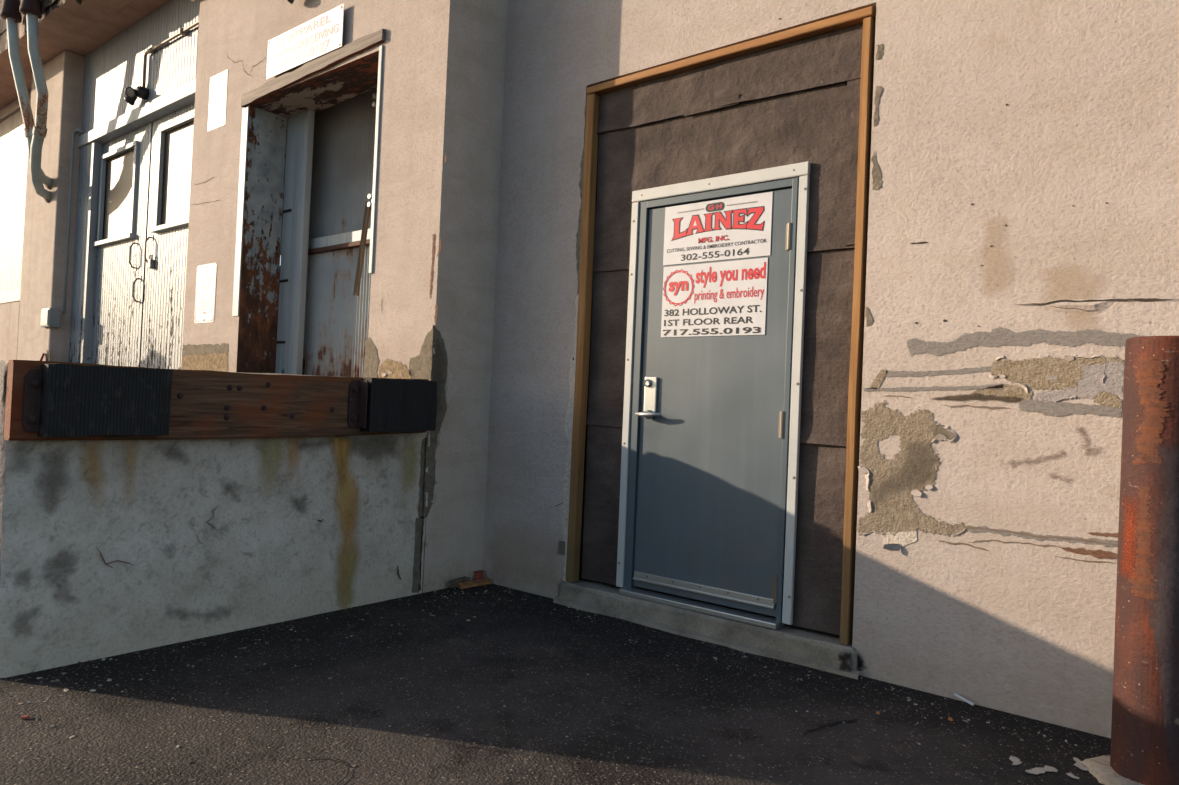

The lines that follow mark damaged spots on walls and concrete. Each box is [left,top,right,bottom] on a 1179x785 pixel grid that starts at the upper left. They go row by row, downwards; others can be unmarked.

crack [1014,297,1174,305]
rust [334,437,357,605]
spalling [855,354,1125,551]